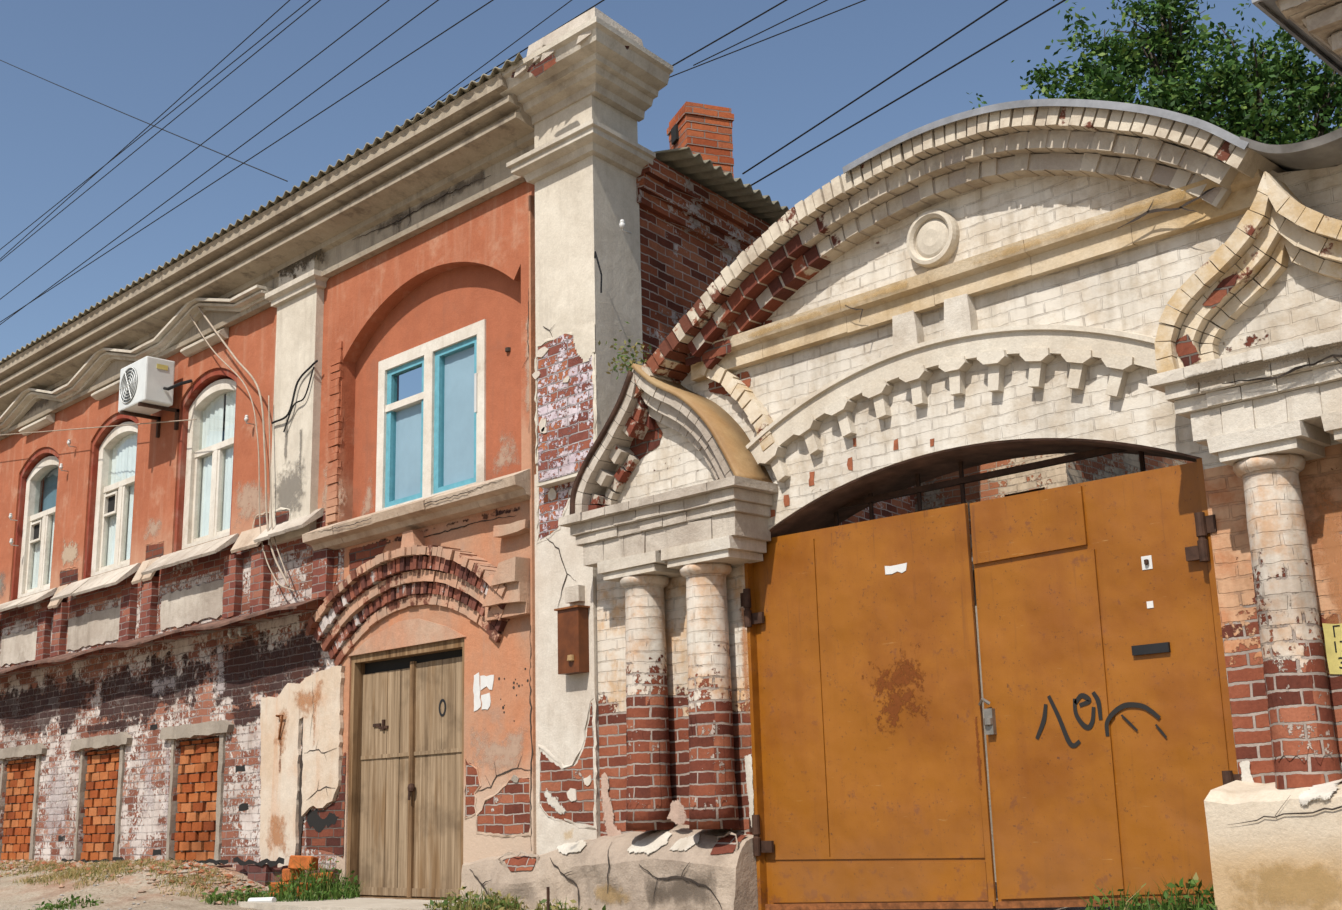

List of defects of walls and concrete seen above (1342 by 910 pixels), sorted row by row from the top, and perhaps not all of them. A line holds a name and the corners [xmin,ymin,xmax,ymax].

spalling [532,321,597,544]
crack [548,540,576,605]
peeling [236,666,346,898]
crack [298,682,336,855]
crack [469,869,490,895]
crack [479,624,722,910]
spalling [464,668,754,871]
rust [862,648,929,733]
crack [1228,796,1342,825]
flaking render [1265,674,1342,806]